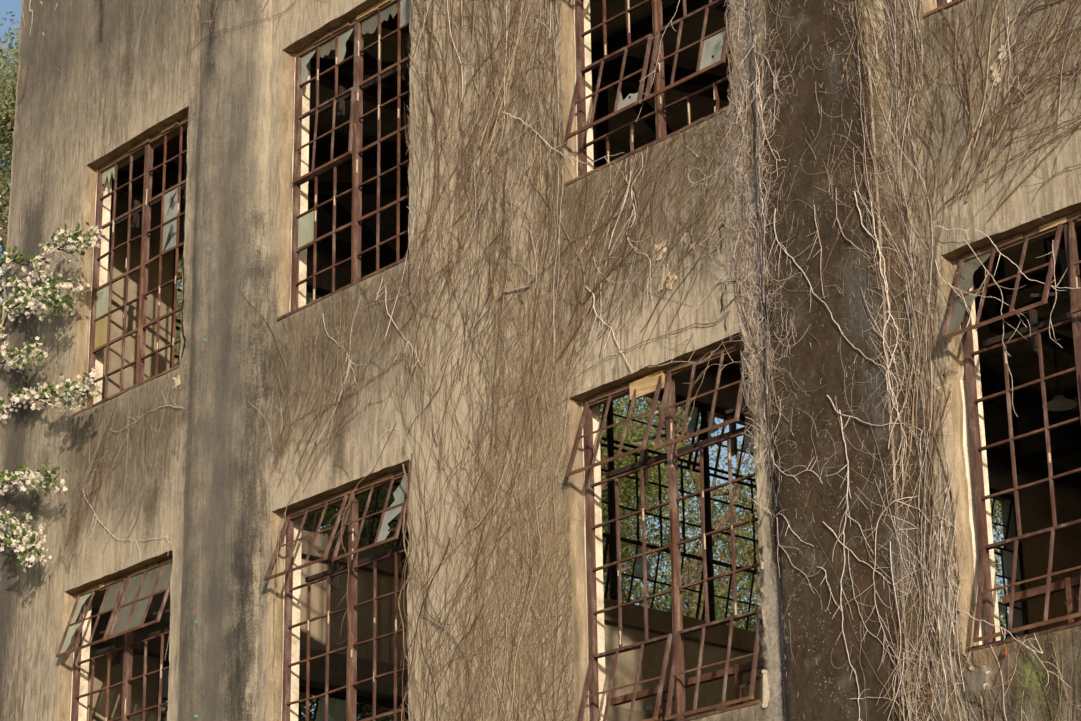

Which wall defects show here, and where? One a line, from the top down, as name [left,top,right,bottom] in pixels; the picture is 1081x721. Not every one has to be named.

water stain [228,257,271,719]
water stain [757,0,935,721]